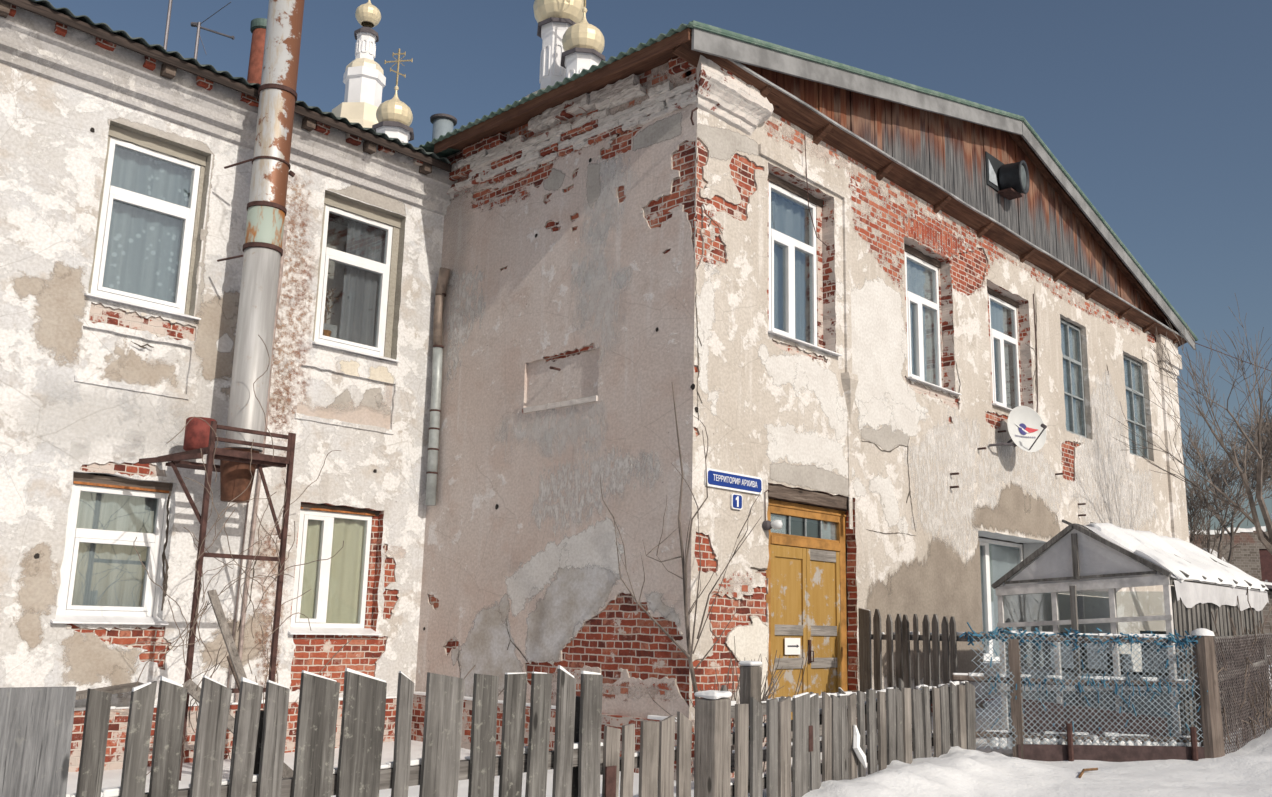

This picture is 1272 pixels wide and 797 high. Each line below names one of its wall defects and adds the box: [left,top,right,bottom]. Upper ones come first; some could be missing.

flaking render [453,62,696,210]
flaking render [12,261,240,397]
rust [269,179,312,423]
flaking render [535,213,579,238]
flaking render [641,139,763,416]
flaking render [297,383,393,429]
flaking render [758,117,1156,683]
flaking render [61,624,174,697]
rust [258,530,283,651]
flaking render [290,635,388,693]
flaking render [383,544,405,620]
flaking render [444,517,769,707]